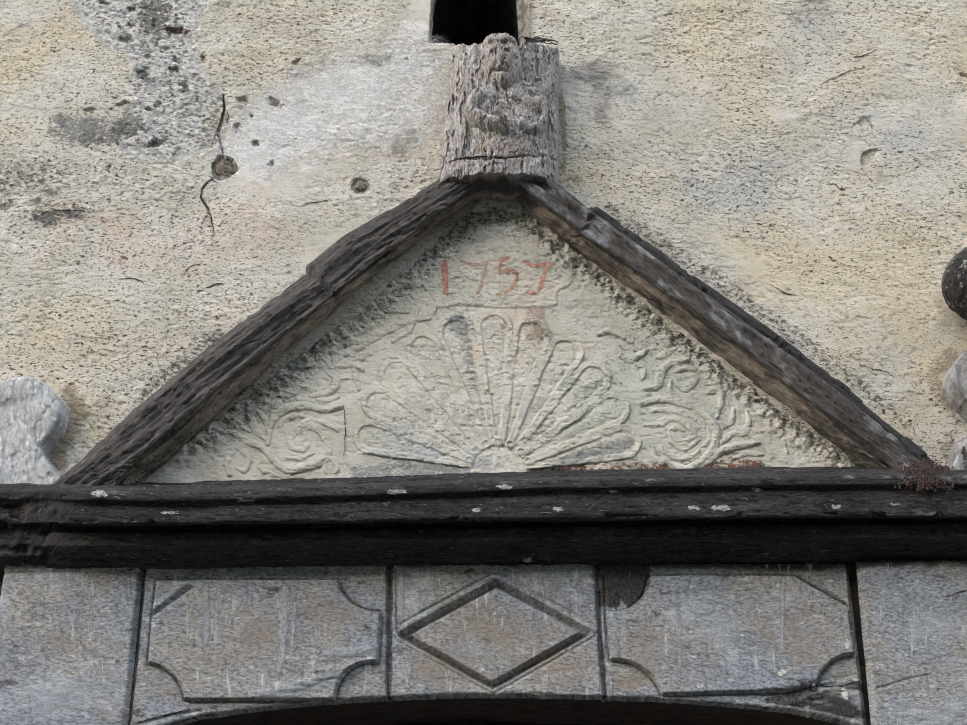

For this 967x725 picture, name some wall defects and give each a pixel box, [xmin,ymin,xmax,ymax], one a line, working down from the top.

peeling [71,0,448,181]
crack [211,95,229,153]
flaking render [351,179,370,194]
water stain [598,564,652,647]
water stain [591,668,614,699]